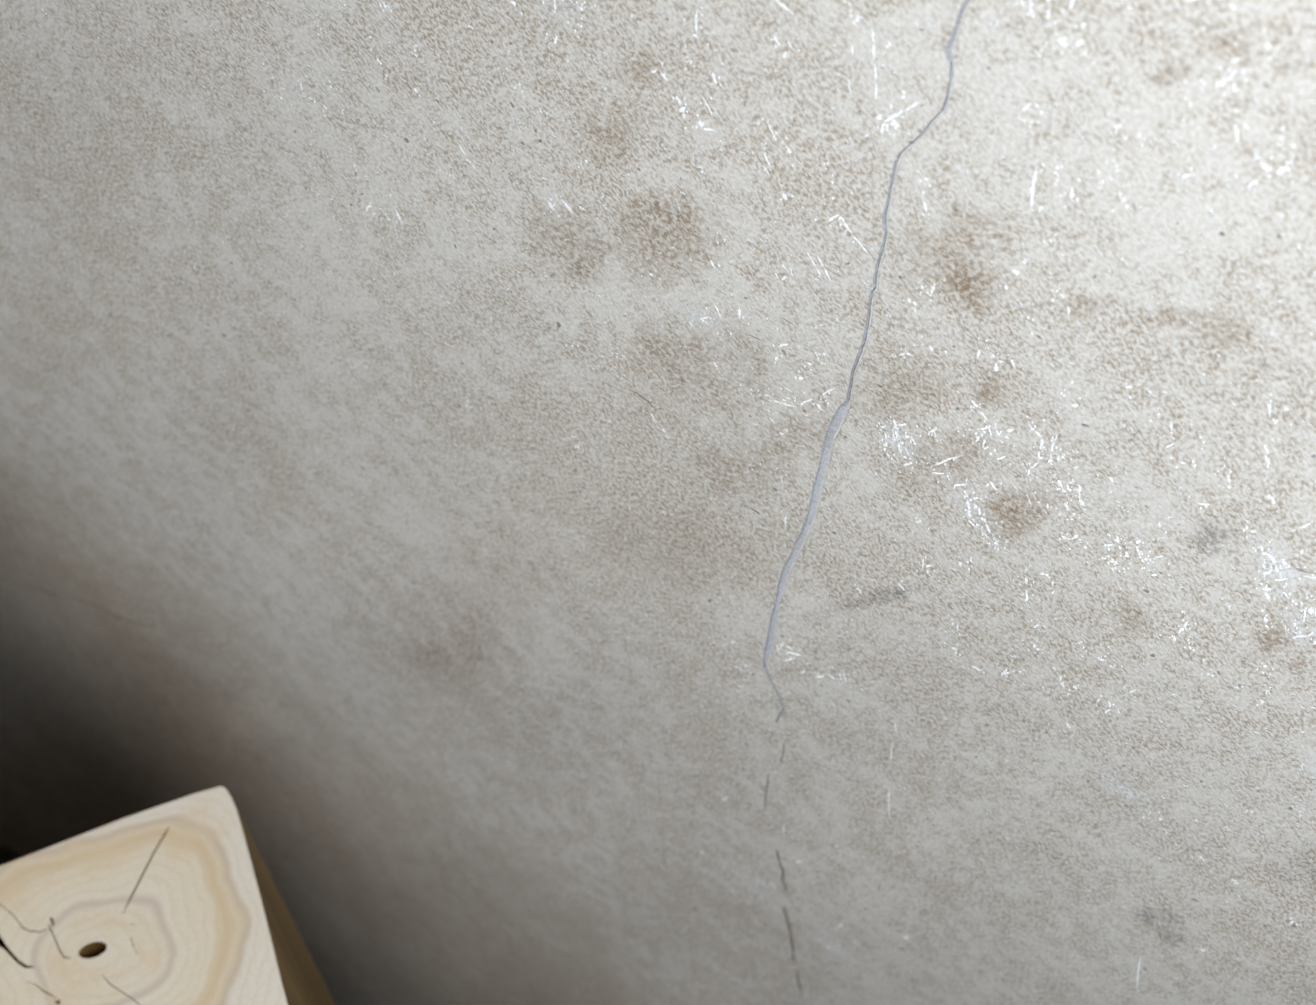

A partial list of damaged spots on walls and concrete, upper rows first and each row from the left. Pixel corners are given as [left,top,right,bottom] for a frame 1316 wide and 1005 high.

crack [763,0,971,811]
crack [776,850,804,1005]